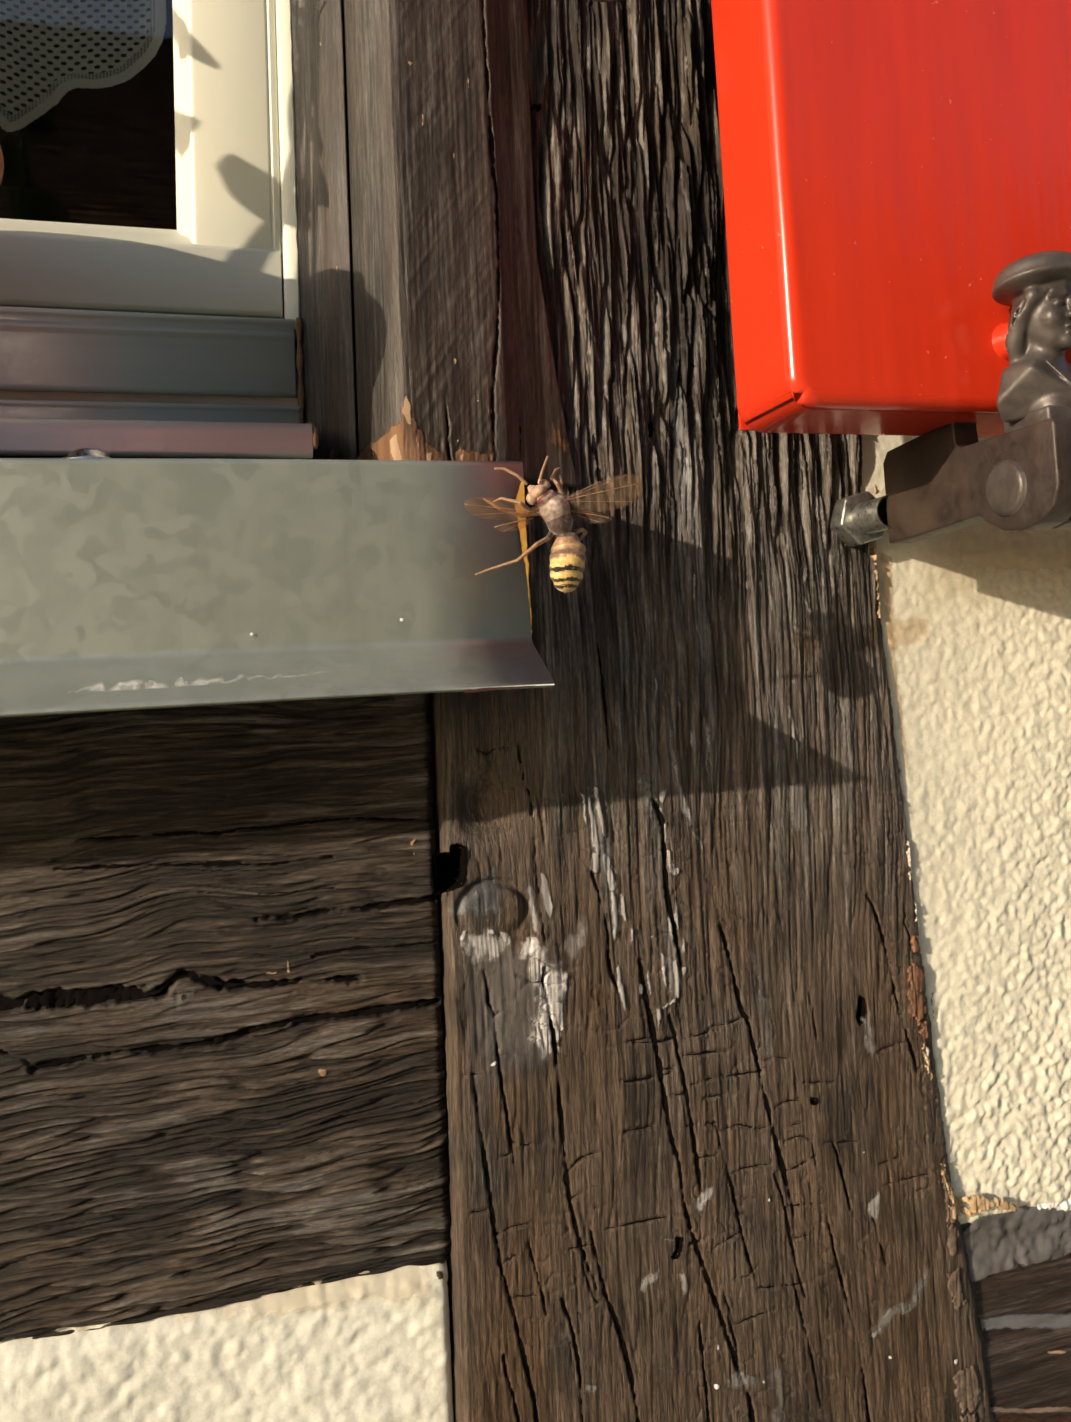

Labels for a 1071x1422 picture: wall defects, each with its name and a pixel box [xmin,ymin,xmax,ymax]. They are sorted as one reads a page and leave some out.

crack [57,817,435,920]
peeling [581,787,633,941]
crack [652,799,681,966]
peeling [659,789,680,875]
crack [0,942,436,1068]
peeling [617,903,687,1030]
crack [465,850,929,1422]